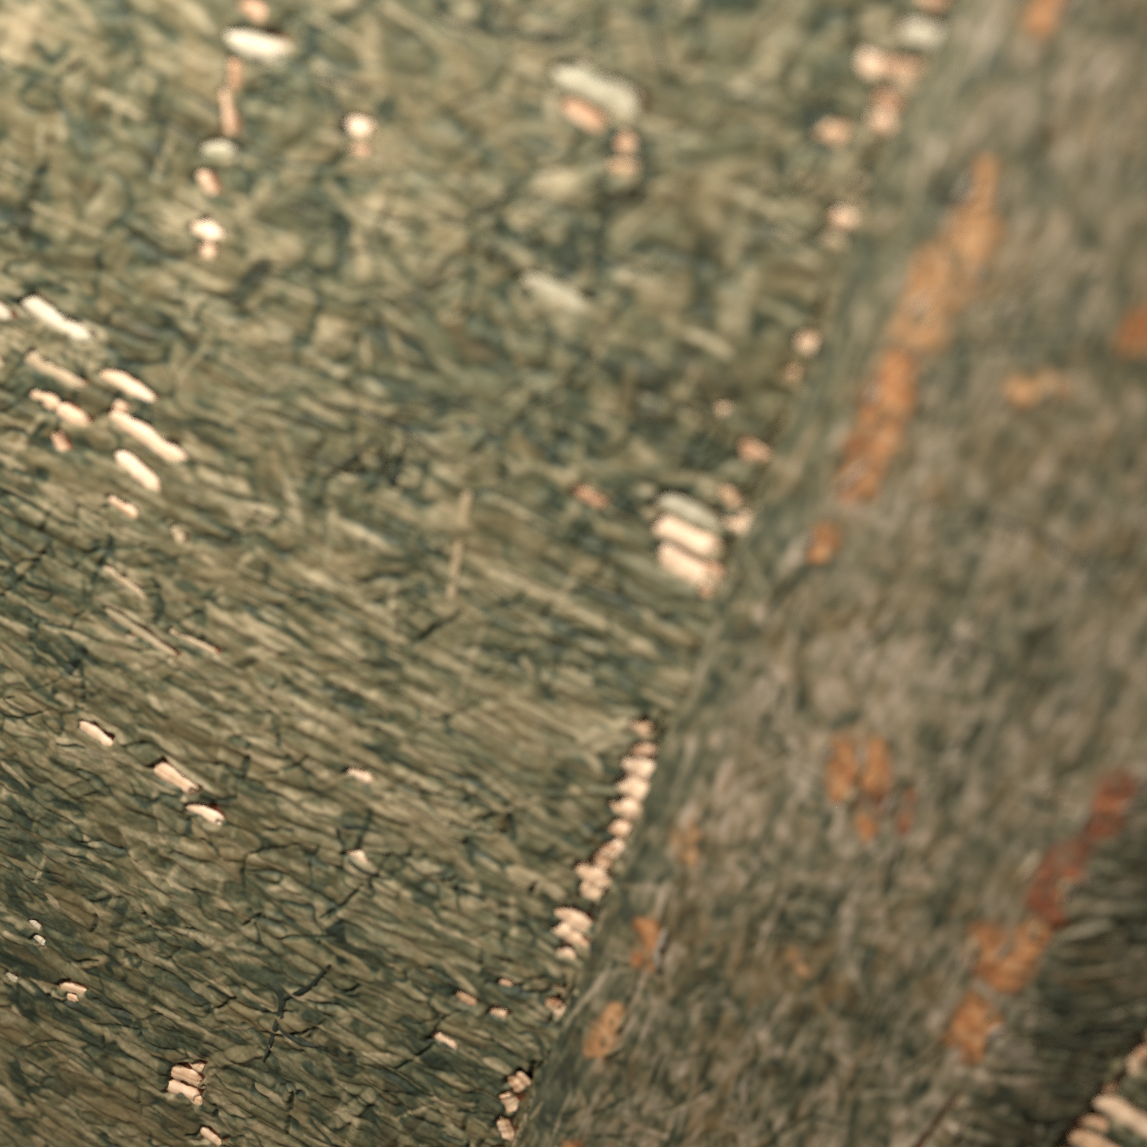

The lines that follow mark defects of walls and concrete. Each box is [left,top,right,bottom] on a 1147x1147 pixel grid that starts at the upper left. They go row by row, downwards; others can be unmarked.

crack [434,0,578,42]
crack [313,69,368,147]
peeling [0,292,97,344]
peeling [24,348,188,491]
crack [293,381,457,489]
peeling [652,486,753,598]
crack [335,824,386,875]
peeling [552,712,658,959]
rust [1077,769,1138,842]
crack [262,964,331,1063]
peeling [495,1067,534,1147]
peeling [1059,1077,1147,1147]